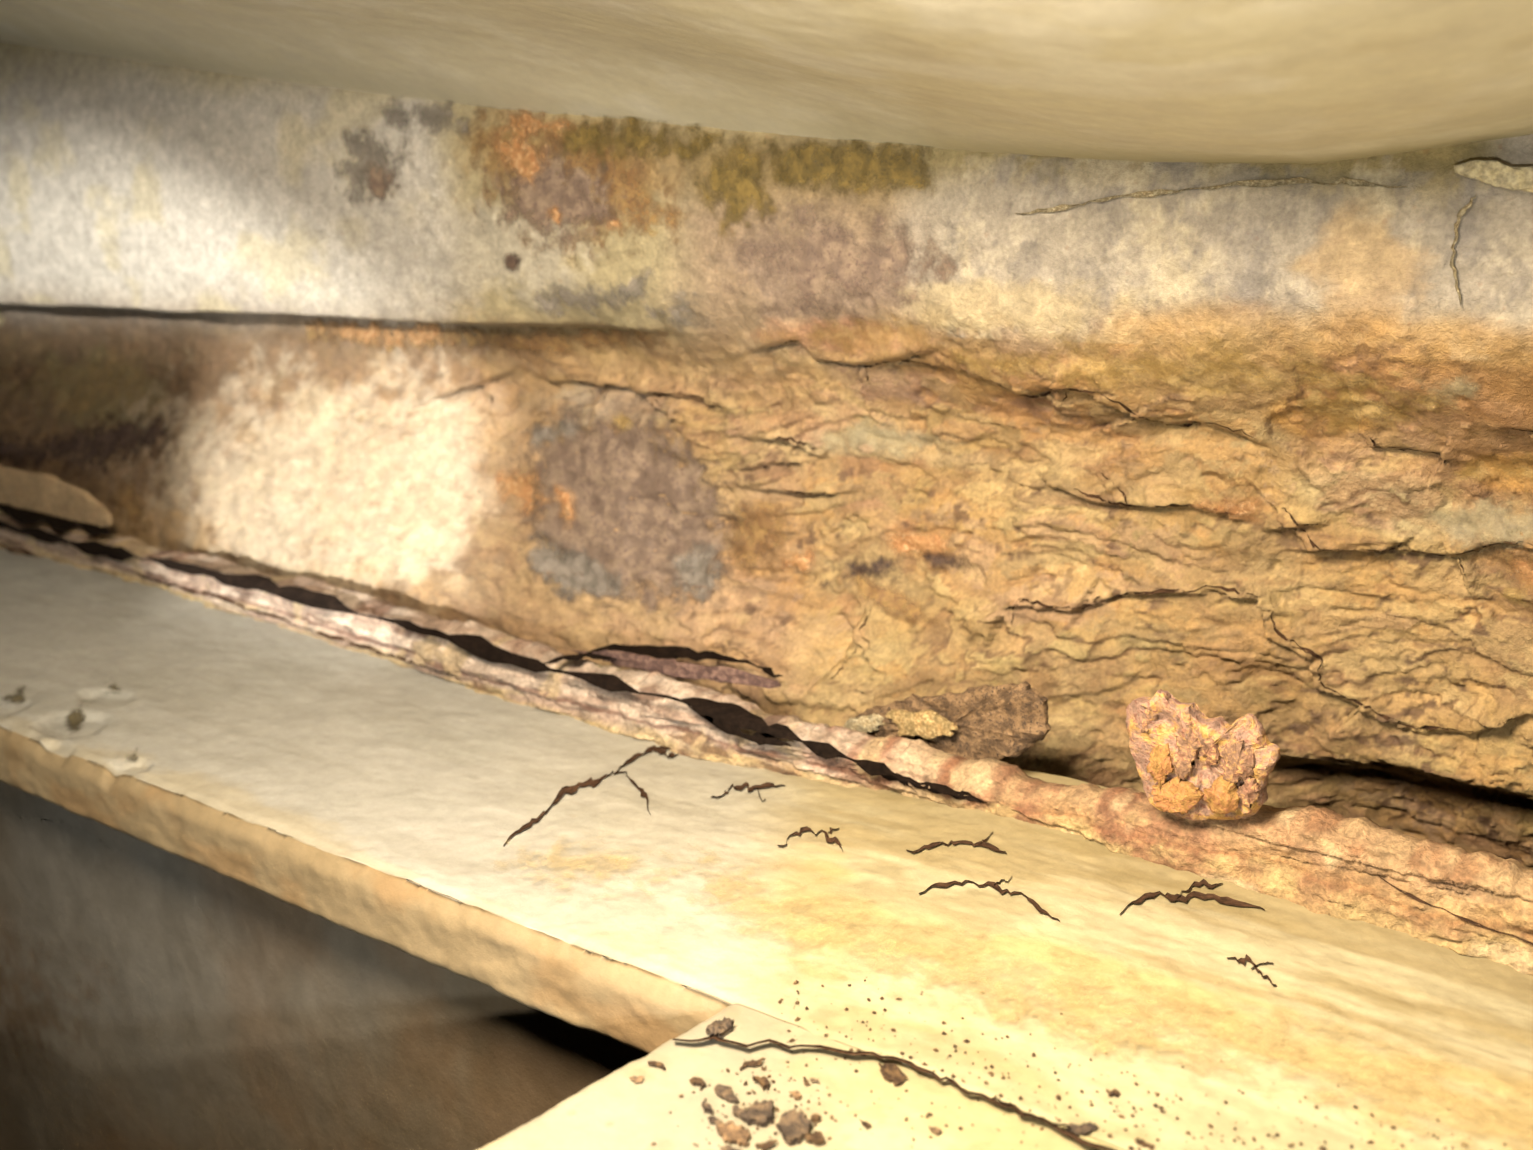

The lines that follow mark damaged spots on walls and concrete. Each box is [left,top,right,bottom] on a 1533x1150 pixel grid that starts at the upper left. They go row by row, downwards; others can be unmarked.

leakage [679,132,930,231]
crack [990,380,1255,439]
peeling [0,465,112,535]
crack [1079,473,1234,515]
crack [1285,509,1532,575]
crack [1011,585,1515,732]
crack [0,504,1060,922]
peeling [629,1061,666,1083]
peeling [689,1077,751,1126]
peeling [739,1058,770,1090]
peeling [806,1113,825,1145]
peeling [880,1063,908,1086]